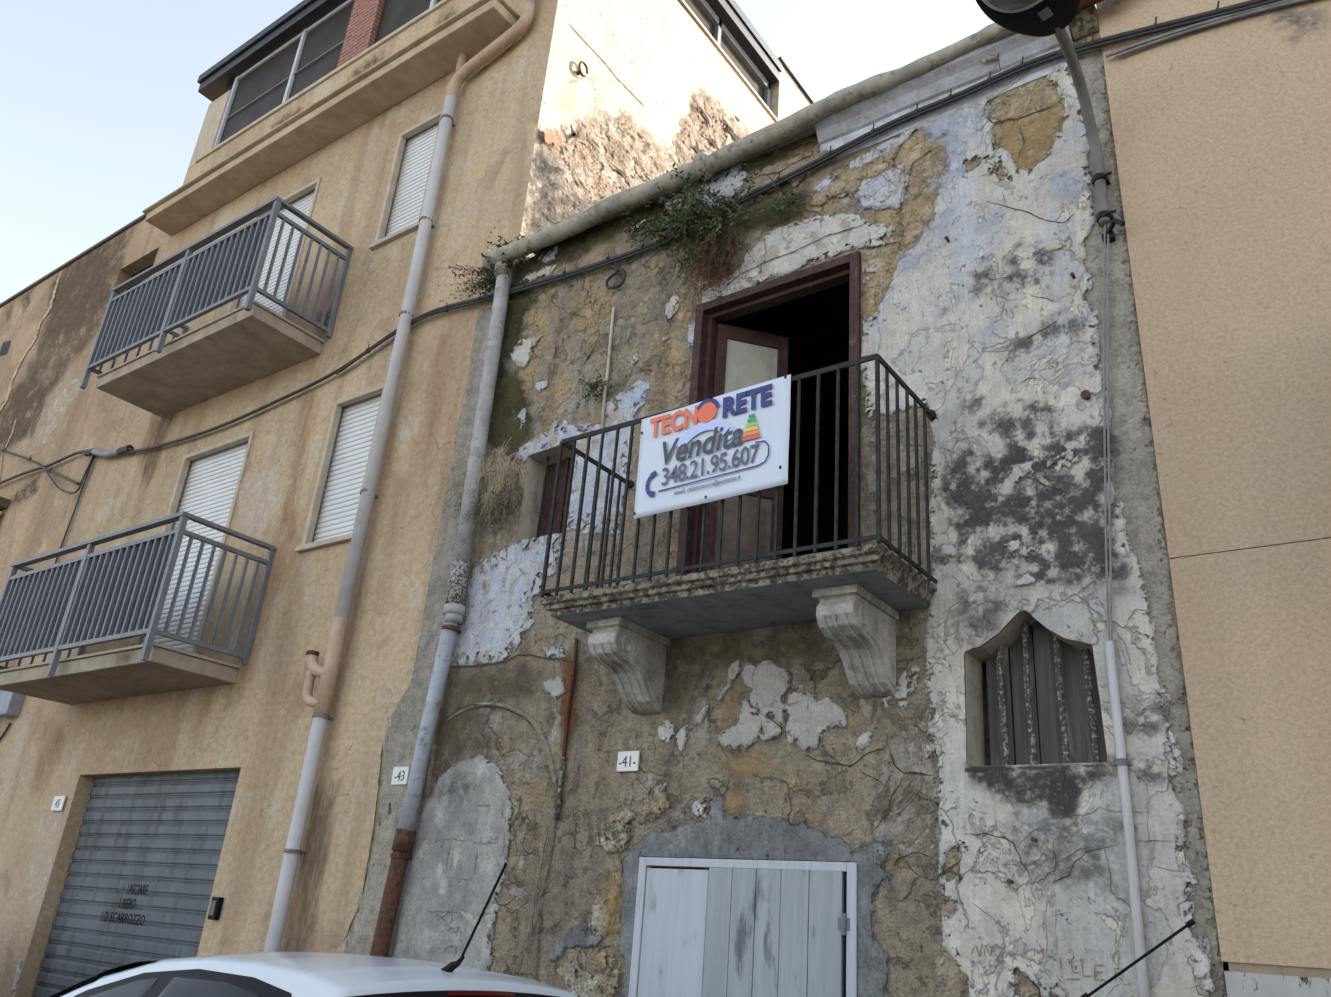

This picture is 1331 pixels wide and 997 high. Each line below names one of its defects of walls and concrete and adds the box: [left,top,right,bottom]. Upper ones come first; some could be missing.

water stain [530,150,597,232]
spalling [630,77,1065,319]
flaking render [520,245,558,282]
crack [0,271,62,474]
water stain [0,233,127,447]
flaking render [510,334,542,368]
water stain [930,397,1129,584]
flaking render [999,448,1079,498]
flaking render [657,659,847,751]
flaking render [882,666,921,714]
crack [966,806,1189,883]
flaking render [1189,949,1215,996]